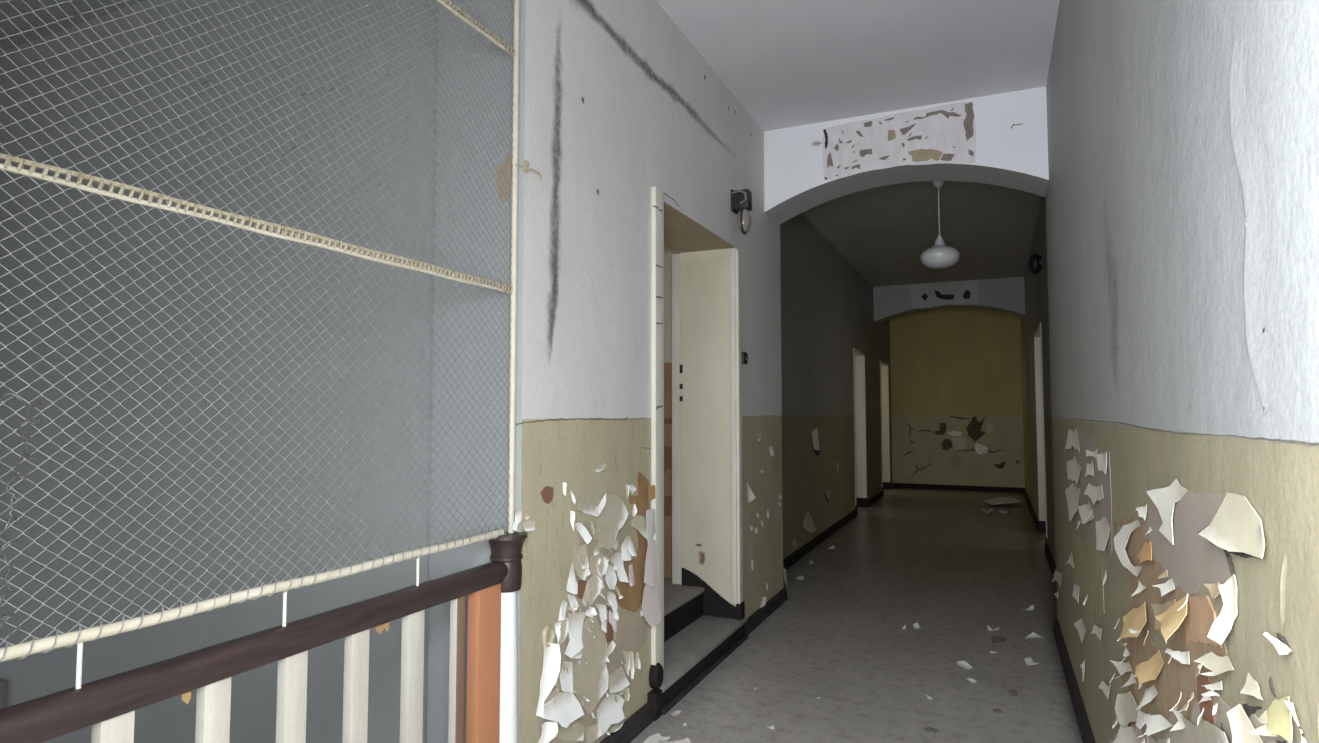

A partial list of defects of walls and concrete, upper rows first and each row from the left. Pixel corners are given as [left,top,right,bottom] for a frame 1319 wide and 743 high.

damp [583,0,696,118]
damp [550,69,560,317]
peeling [822,101,976,181]
peeling [664,445,672,472]
peeling [747,483,782,533]
peeling [920,415,1019,469]
peeling [536,463,672,743]
peeling [1052,424,1307,743]